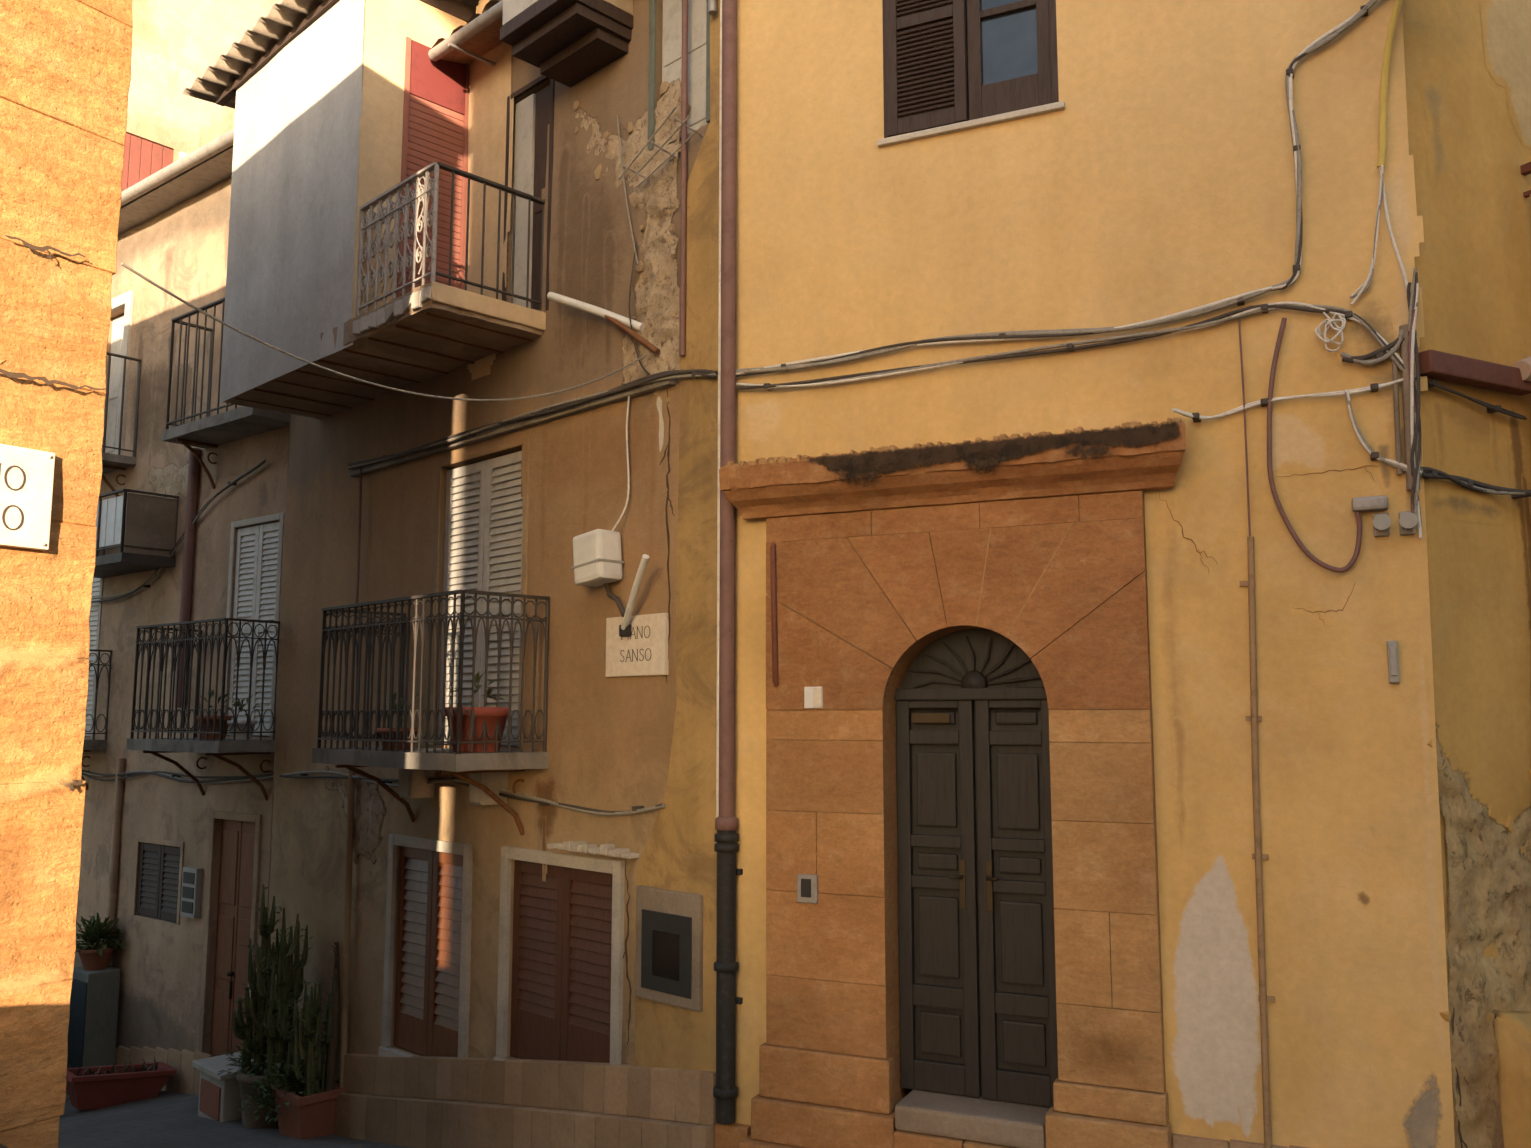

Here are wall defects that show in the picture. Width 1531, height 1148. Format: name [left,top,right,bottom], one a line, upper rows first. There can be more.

flaking render [1480,0,1531,149]
crack [1159,493,1218,572]
flaking render [1404,725,1531,1148]